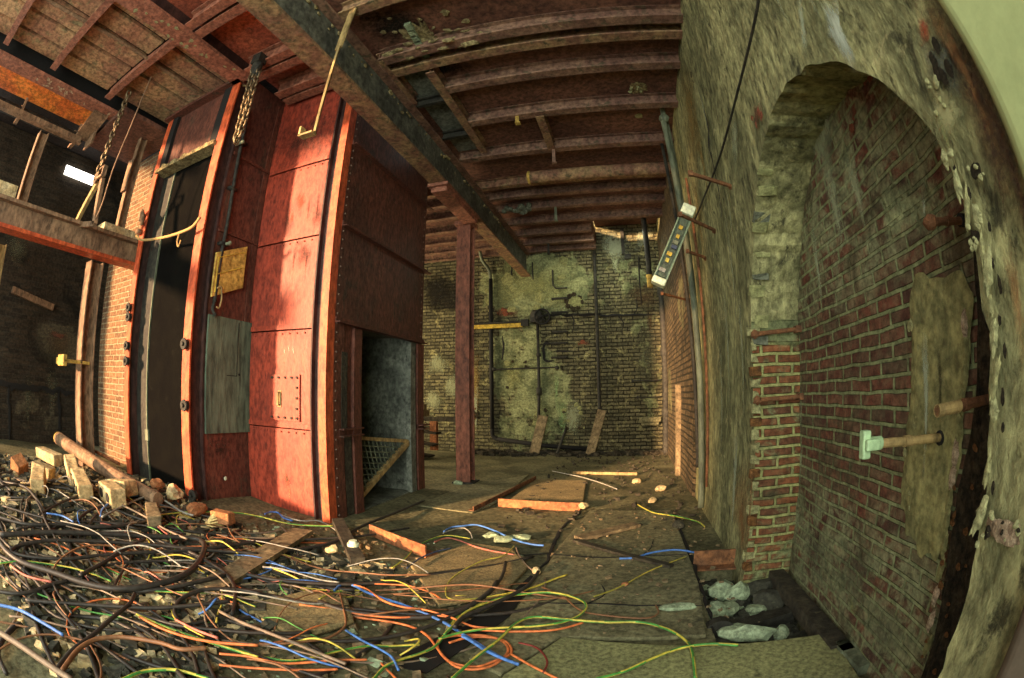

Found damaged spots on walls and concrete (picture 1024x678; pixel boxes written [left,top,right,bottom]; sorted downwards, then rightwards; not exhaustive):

peeling [925,37,1007,433]
spalling [742,315,769,571]